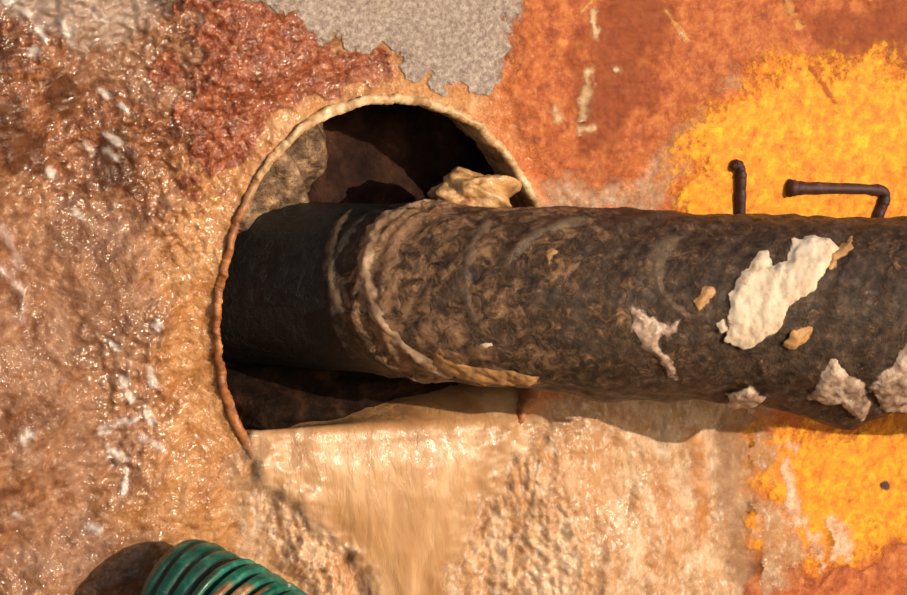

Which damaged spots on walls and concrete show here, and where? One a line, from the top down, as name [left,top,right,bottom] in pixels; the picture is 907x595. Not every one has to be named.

spalling [251,0,524,97]
corrosion [147,0,396,213]
corrosion [504,0,907,192]
damp [103,133,123,160]
damp [0,223,22,265]
damp [120,376,136,404]
damp [147,368,159,388]
damp [97,407,155,435]
damp [105,445,129,495]
corrosion [743,537,907,595]